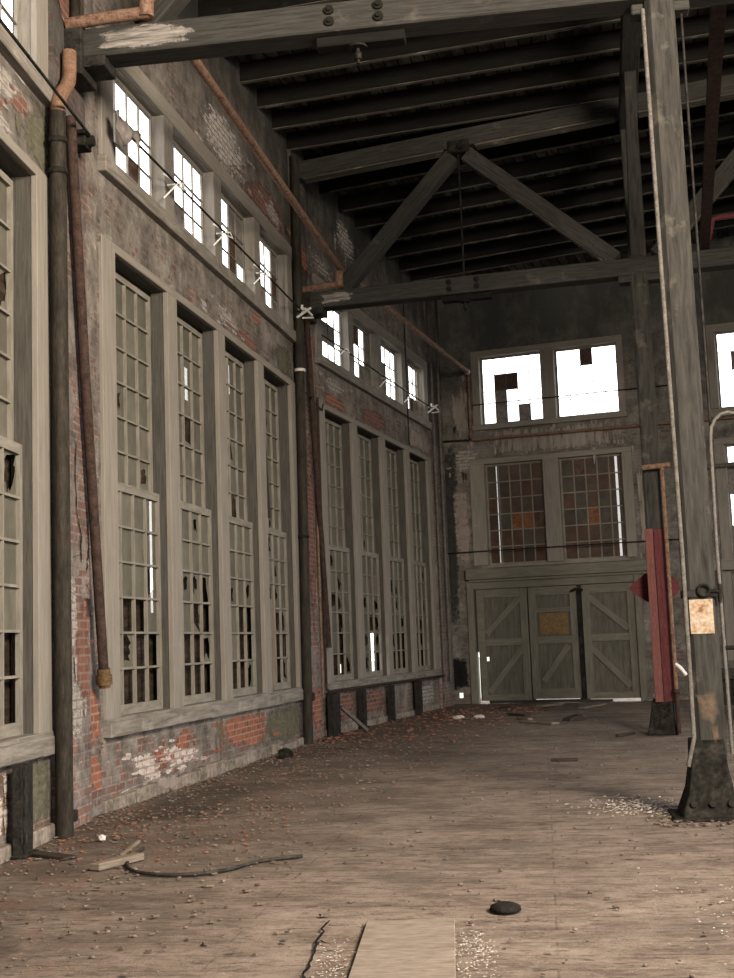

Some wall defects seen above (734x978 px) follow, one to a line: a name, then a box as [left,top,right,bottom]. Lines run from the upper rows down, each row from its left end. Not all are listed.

flaking render [121,708,280,786]
crack [302,920,332,978]